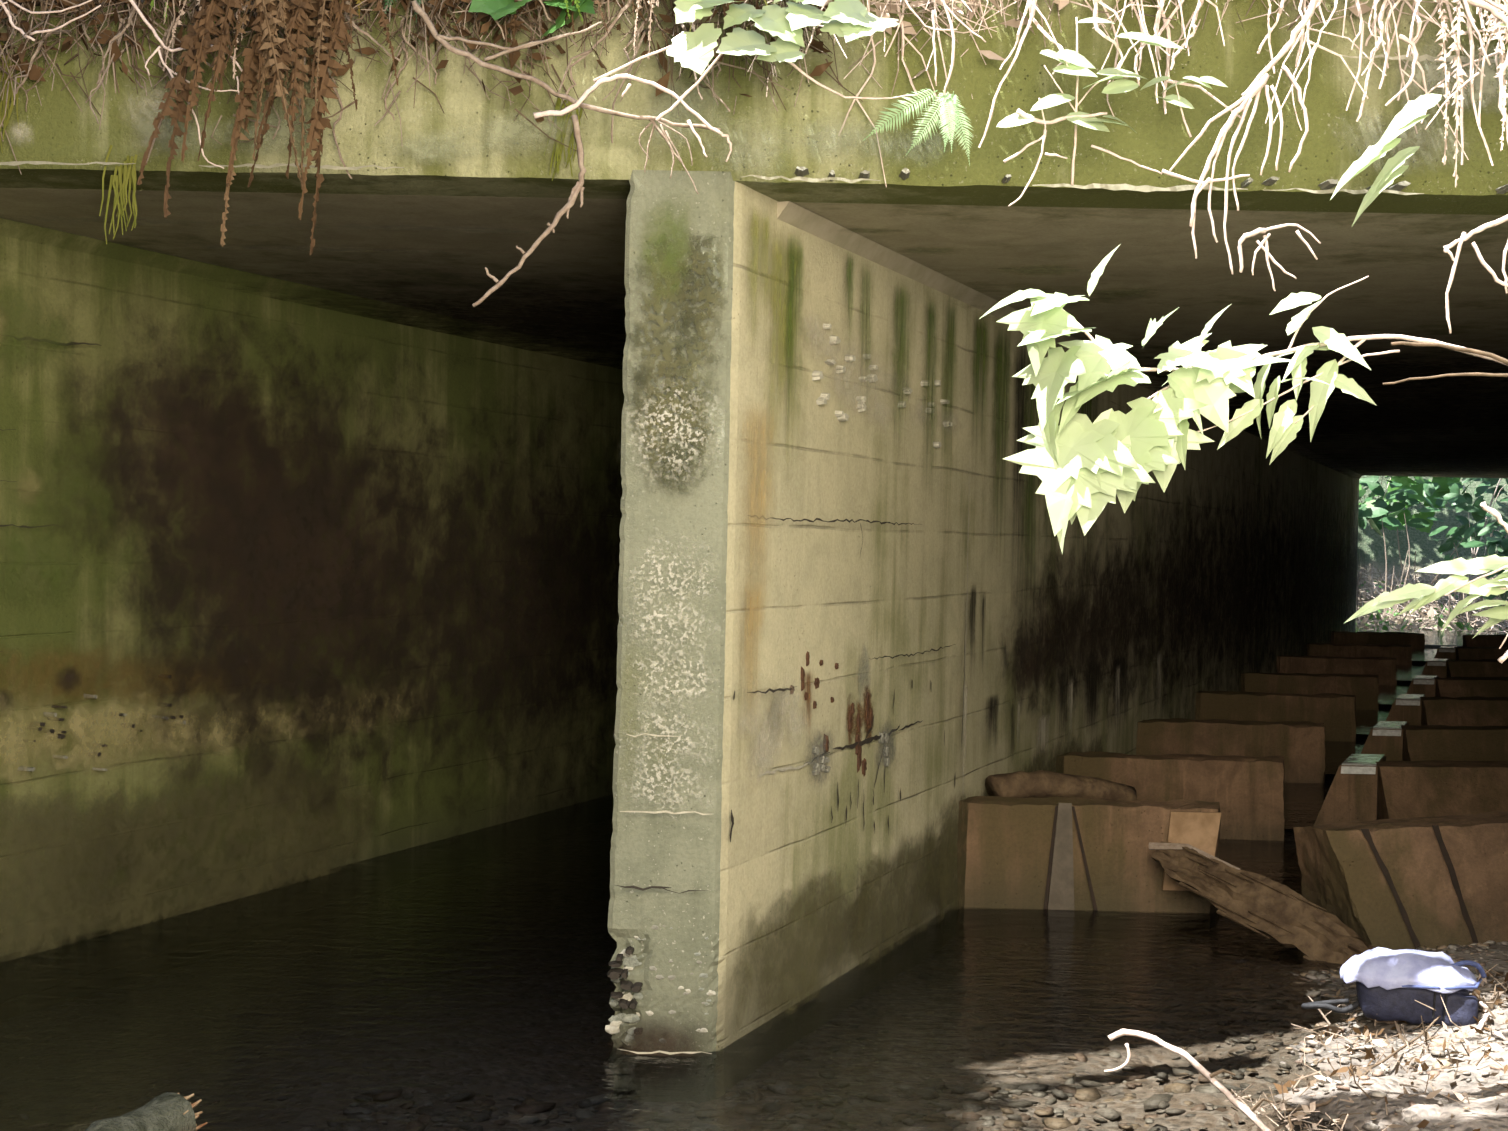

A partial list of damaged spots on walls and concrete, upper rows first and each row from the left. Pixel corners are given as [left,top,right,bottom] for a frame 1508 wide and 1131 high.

crack [2,335,101,346]
leakage [278,217,726,492]
leakage [752,215,803,384]
leakage [847,257,870,350]
rust [790,651,873,776]
leakage [737,796,968,1012]
spalling [605,925,716,1042]